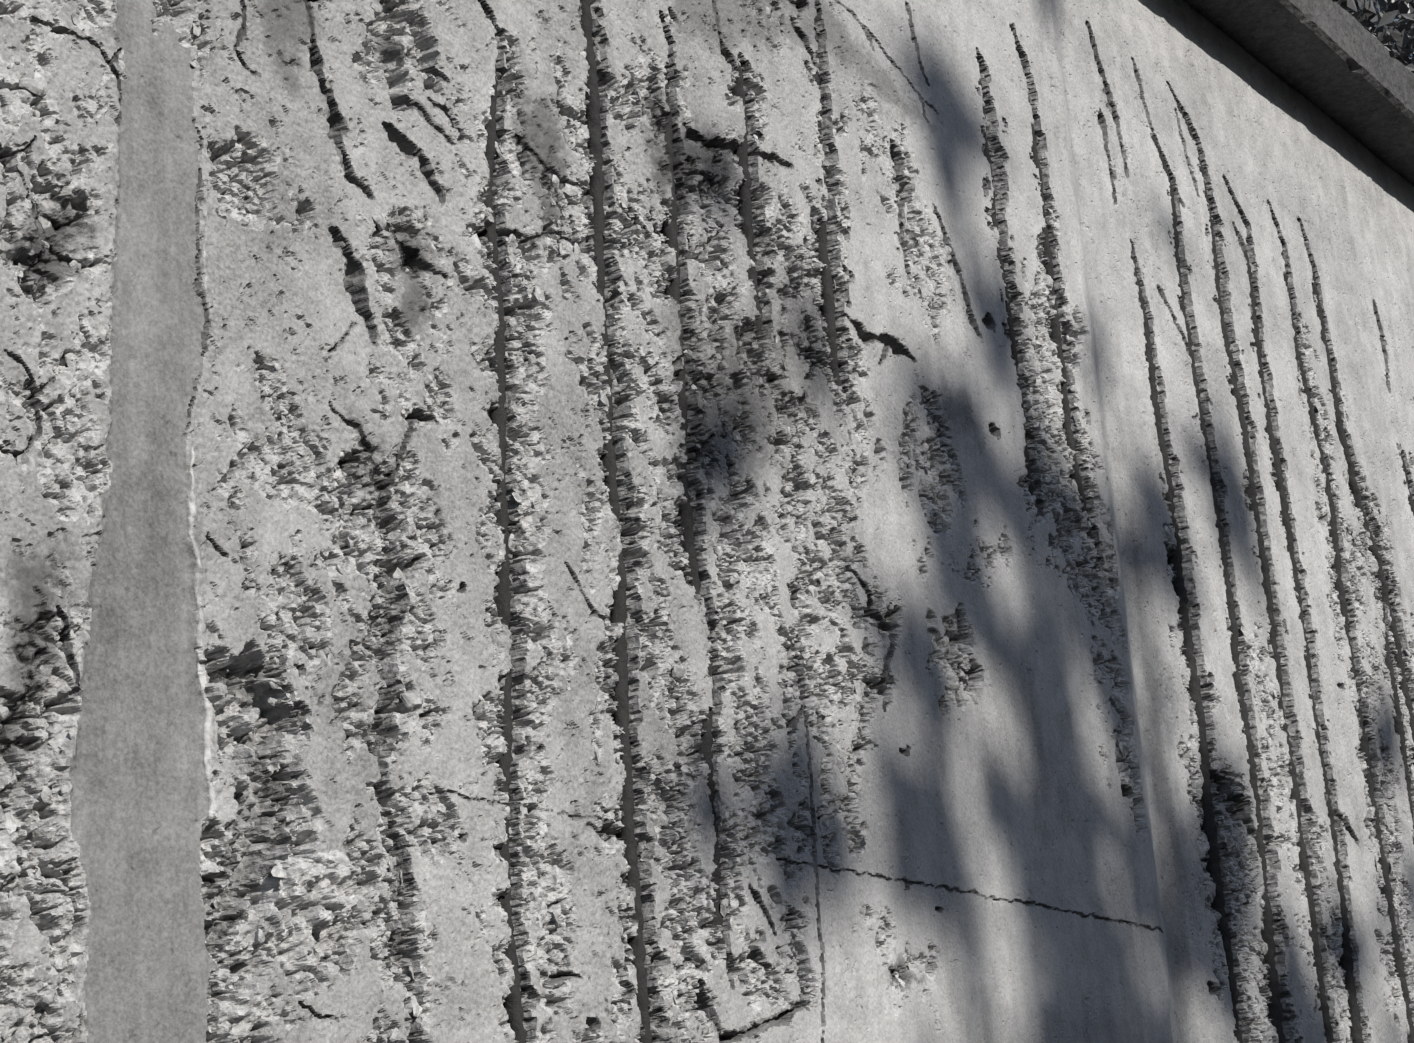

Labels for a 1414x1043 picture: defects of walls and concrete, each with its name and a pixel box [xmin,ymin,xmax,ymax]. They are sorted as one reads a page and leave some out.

crack [0,348,56,461]
spalling [0,546,92,1043]
spalling [0,0,125,558]
crack [184,117,211,431]
spalling [200,120,317,261]
spalling [196,350,468,1043]
spalling [350,0,1148,1043]
crack [673,565,1164,1043]
spalling [1162,523,1352,1043]
spalling [1292,300,1414,1043]